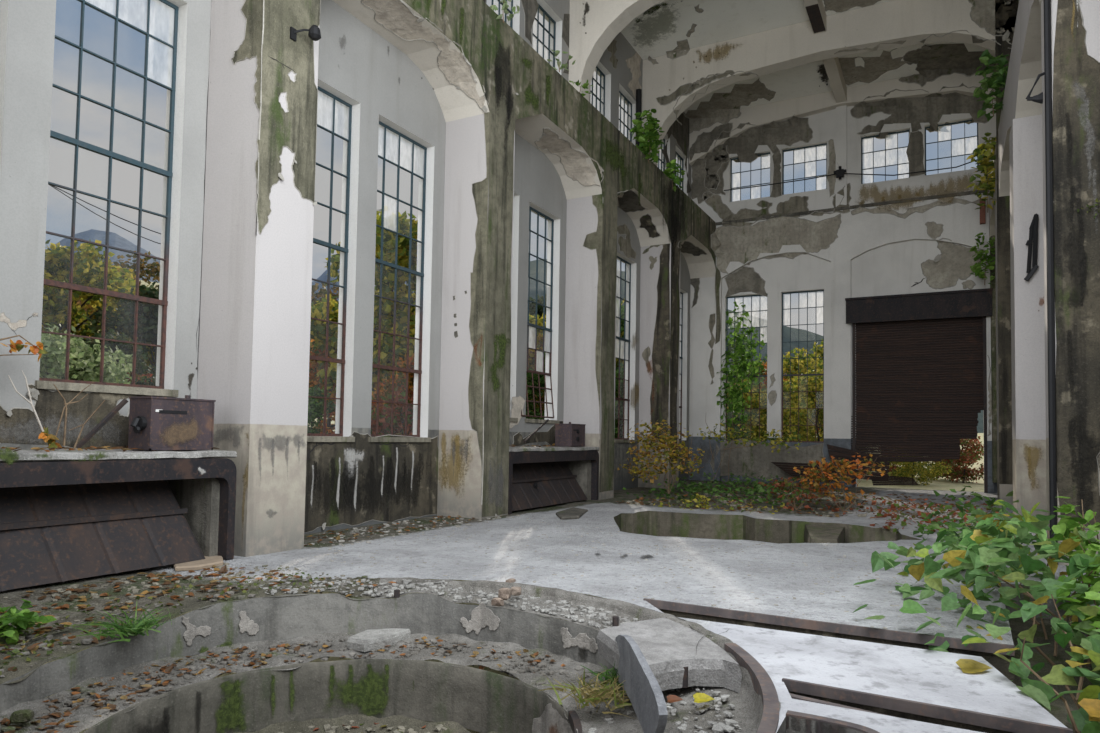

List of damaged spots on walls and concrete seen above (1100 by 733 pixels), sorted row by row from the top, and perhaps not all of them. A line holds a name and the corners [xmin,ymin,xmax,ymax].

corrosion [161,419,197,445]
flaking render [231,0,321,236]
water stain [311,447,423,514]
flaking render [361,0,563,517]
flaking render [535,70,983,492]
flaking render [823,0,881,12]
flaking render [834,0,1019,484]
flaking render [1052,0,1100,530]